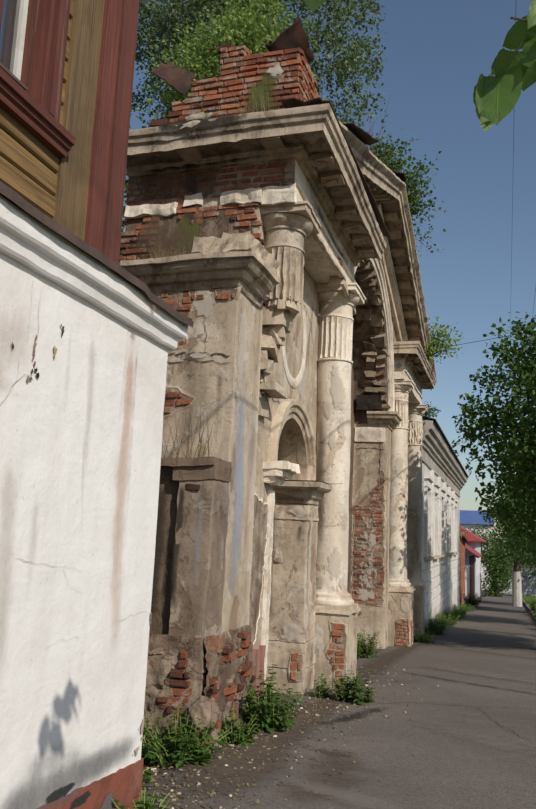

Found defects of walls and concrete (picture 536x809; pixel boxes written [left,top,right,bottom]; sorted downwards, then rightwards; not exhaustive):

flaking render [119,158,297,266]
flaking render [153,287,241,318]
flaking render [169,336,207,362]
crack [167,322,231,364]
flaking render [163,385,197,419]
flaking render [316,470,401,608]
flaking render [394,617,413,647]
flaking render [324,620,349,689]
leakage [8,746,128,809]